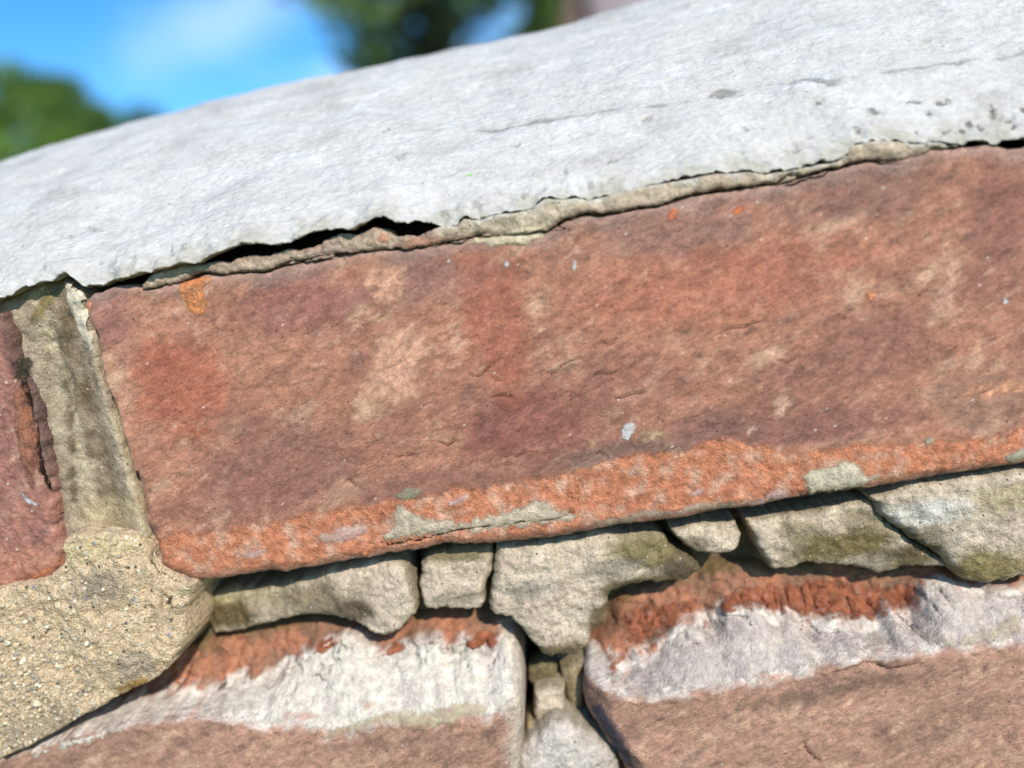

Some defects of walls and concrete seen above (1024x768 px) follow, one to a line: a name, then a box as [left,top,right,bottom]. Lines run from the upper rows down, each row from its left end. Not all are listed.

crack [550,160,906,231]
crack [205,216,489,273]
crack [21,373,53,493]
spalling [315,637,337,653]
spalling [383,641,405,656]
spalling [465,629,498,650]
spalling [623,599,701,644]
spalling [720,578,925,621]